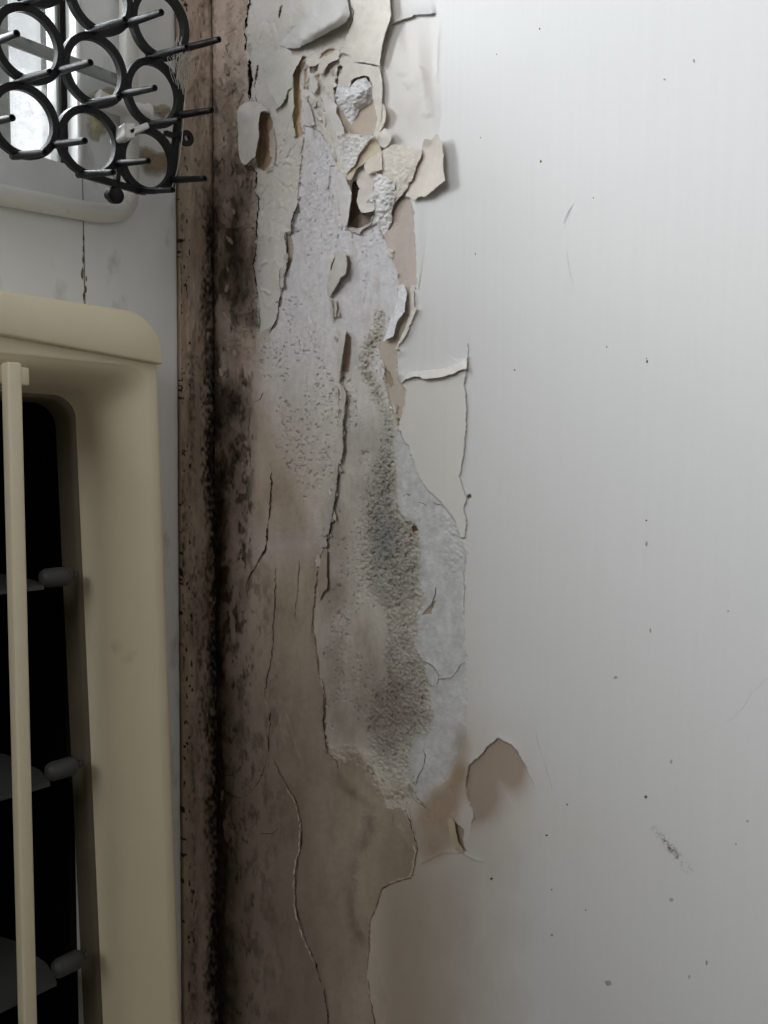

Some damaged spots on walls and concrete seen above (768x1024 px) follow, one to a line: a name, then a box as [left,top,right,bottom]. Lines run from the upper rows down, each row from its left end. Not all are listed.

crack [219,393,338,1024]
damp [182,0,418,1024]
spalling [237,0,468,811]
peeling [448,740,535,853]